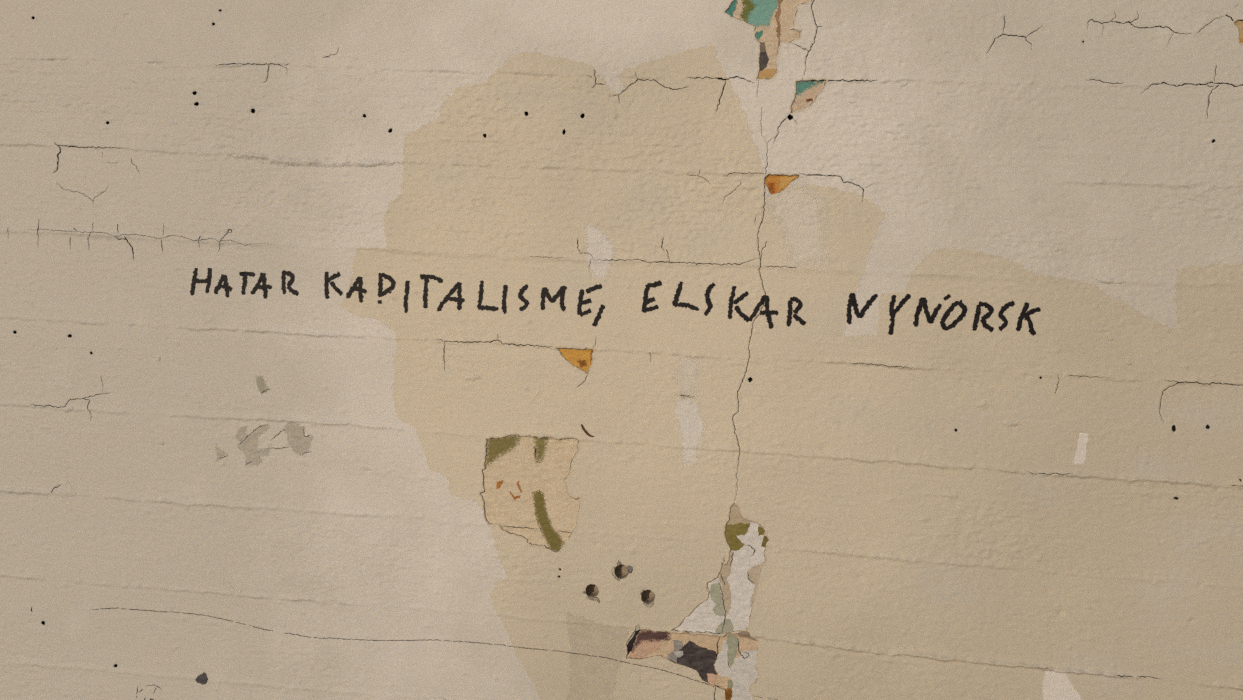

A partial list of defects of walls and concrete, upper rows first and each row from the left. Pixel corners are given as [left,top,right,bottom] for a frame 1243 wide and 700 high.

peeling [723,0,813,81]
crack [792,0,905,103]
crack [987,16,1042,53]
crack [1087,6,1236,43]
peeling [789,78,828,114]
crack [1090,65,1243,118]
peeling [763,172,801,196]
crack [801,173,866,202]
crack [530,69,797,501]
peeling [554,346,595,375]
peeling [478,433,581,554]
peeling [624,501,770,700]